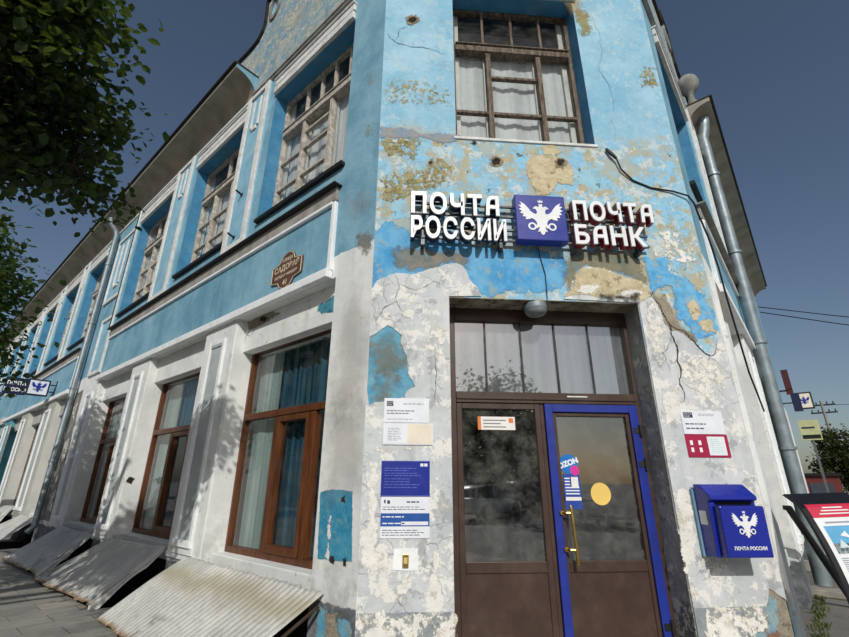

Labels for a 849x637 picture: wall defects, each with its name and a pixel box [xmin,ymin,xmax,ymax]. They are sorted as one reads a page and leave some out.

rust [572,0,591,36]
peeling [386,80,450,104]
peeling [526,145,574,196]
peeling [372,221,728,365]
peeling [367,310,415,405]
crack [650,292,717,402]
peeling [662,357,725,424]
peeling [315,465,458,637]
peeling [676,488,729,601]
peeling [704,589,797,637]